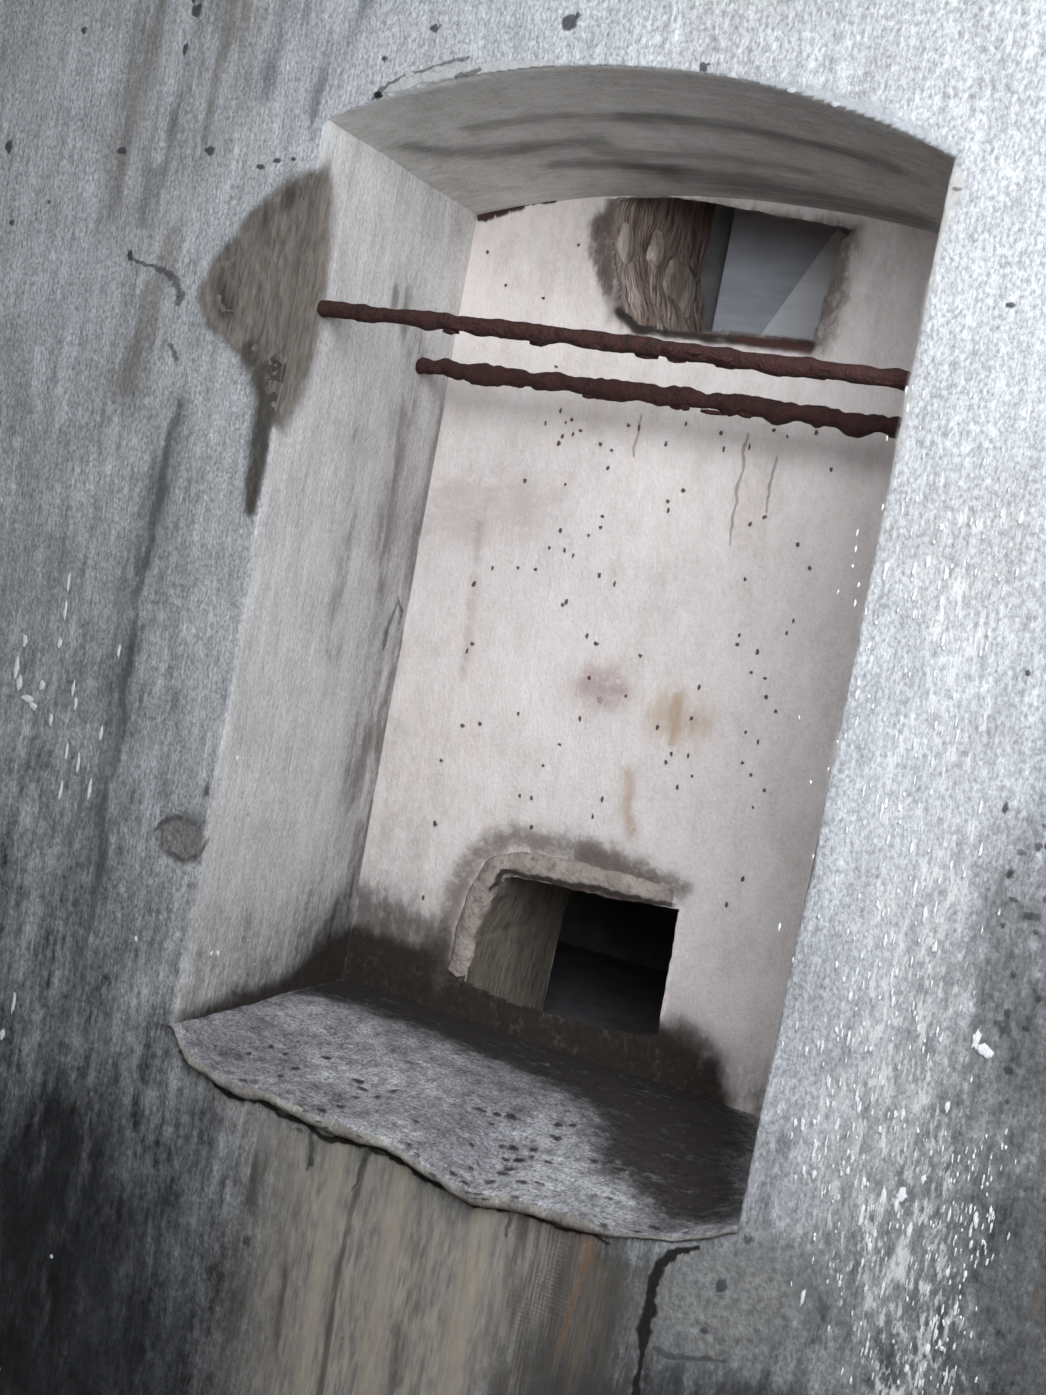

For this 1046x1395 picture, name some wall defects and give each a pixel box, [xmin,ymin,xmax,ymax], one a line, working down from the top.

corrosion [442,323,496,335]
corrosion [635,344,734,370]
corrosion [669,405,755,452]
leakage [436,831,686,987]
leakage [0,1097,175,1395]
leakage [243,1126,739,1395]